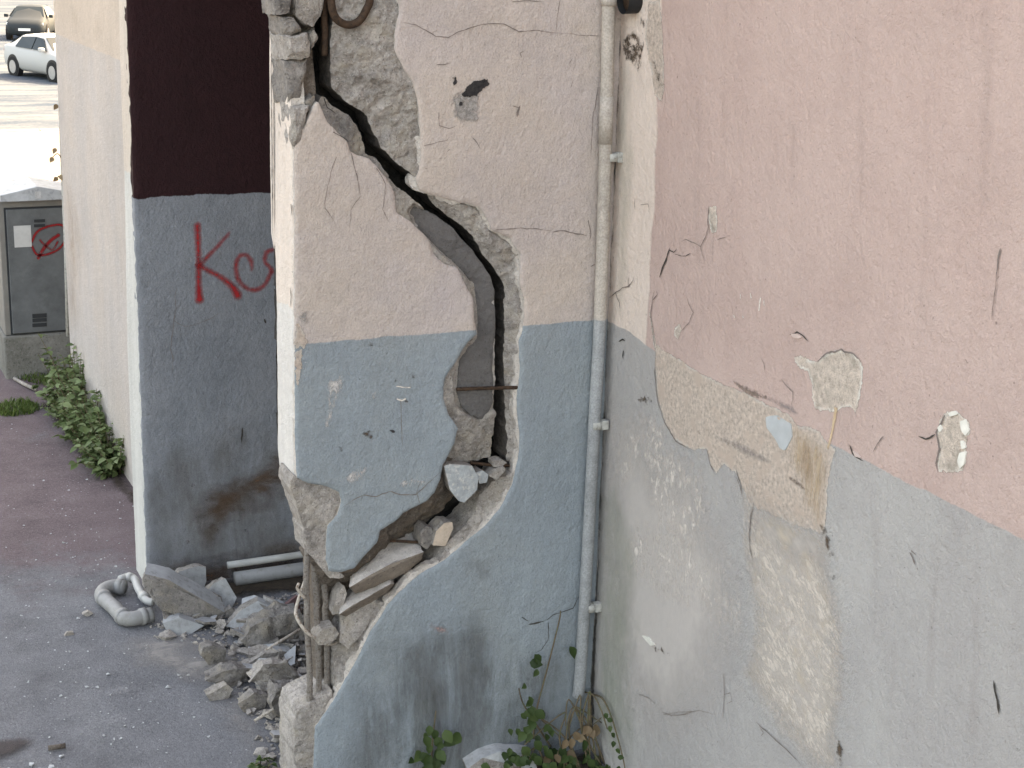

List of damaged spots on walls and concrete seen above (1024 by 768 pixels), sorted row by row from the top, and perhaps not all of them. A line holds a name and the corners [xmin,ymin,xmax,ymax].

crack [314,15,481,262]
crack [496,220,591,238]
crack [609,228,725,347]
spalling [261,0,523,768]
crack [469,436,500,469]
peeling [919,411,970,473]
corrosion [210,470,279,529]
crack [343,475,460,547]
peeling [617,312,863,760]